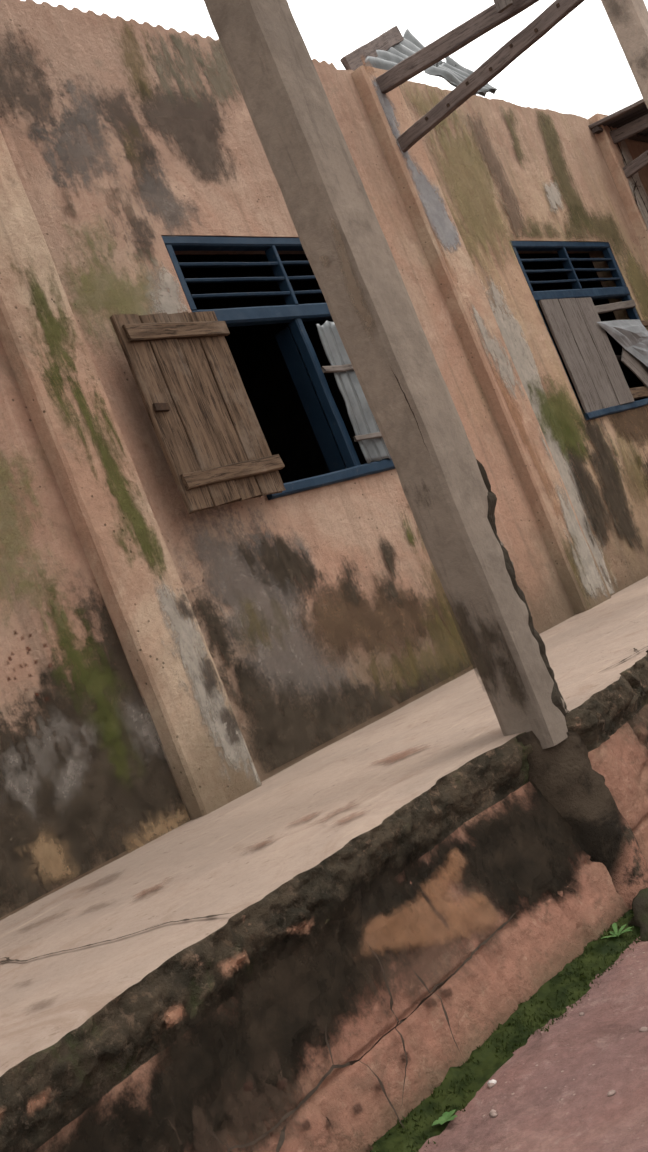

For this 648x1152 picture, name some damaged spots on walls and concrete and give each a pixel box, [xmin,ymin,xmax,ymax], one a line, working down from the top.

leakage [0,35,240,260]
leakage [470,111,525,237]
leakage [53,376,166,579]
leakage [178,508,524,770]
spalling [476,459,567,716]
leakage [567,406,648,549]
leakage [0,589,185,918]
crack [0,911,240,963]
leakage [14,782,589,1152]